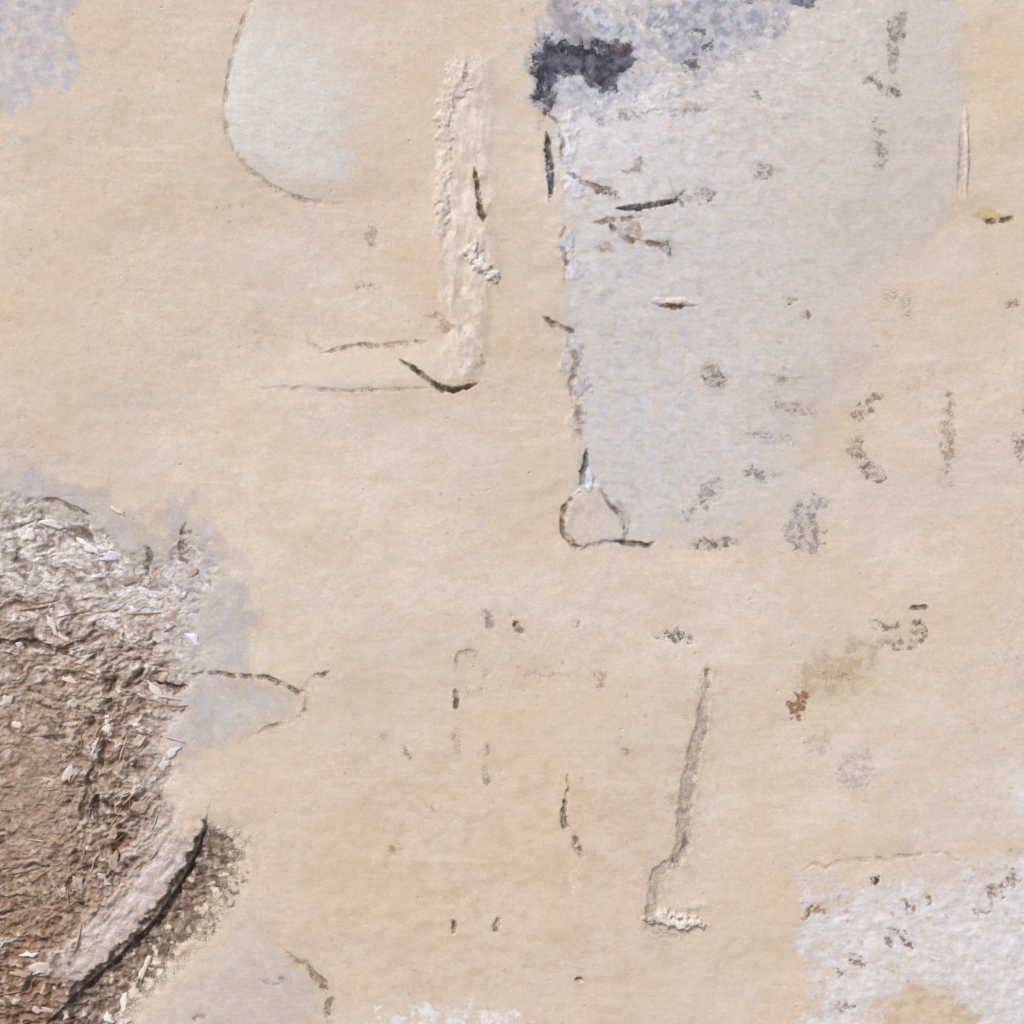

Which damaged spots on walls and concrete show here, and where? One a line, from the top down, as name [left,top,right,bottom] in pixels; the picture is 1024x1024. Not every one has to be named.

damp [626,0,790,90]
crack [223,11,334,205]
crack [263,334,475,395]
damp [938,376,957,488]
crack [187,669,330,735]
corrosion [786,690,809,721]
flaking render [0,497,214,1024]
crack [635,664,719,949]
flaking render [197,865,249,941]